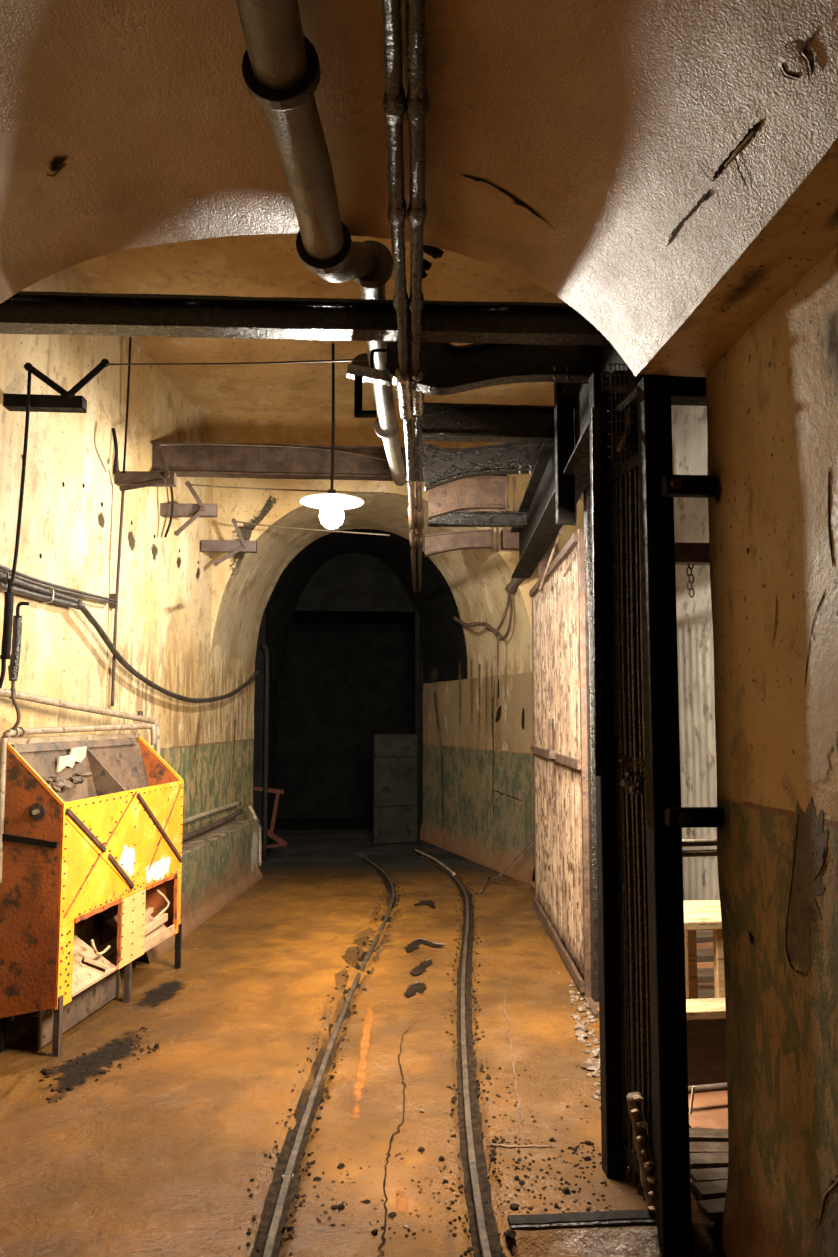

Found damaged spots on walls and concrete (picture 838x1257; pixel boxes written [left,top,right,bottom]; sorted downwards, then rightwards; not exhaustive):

crack [666,122,761,247]
peeling [827,458,838,566]
peeling [784,581,838,976]
crack [377,1021,416,1257]